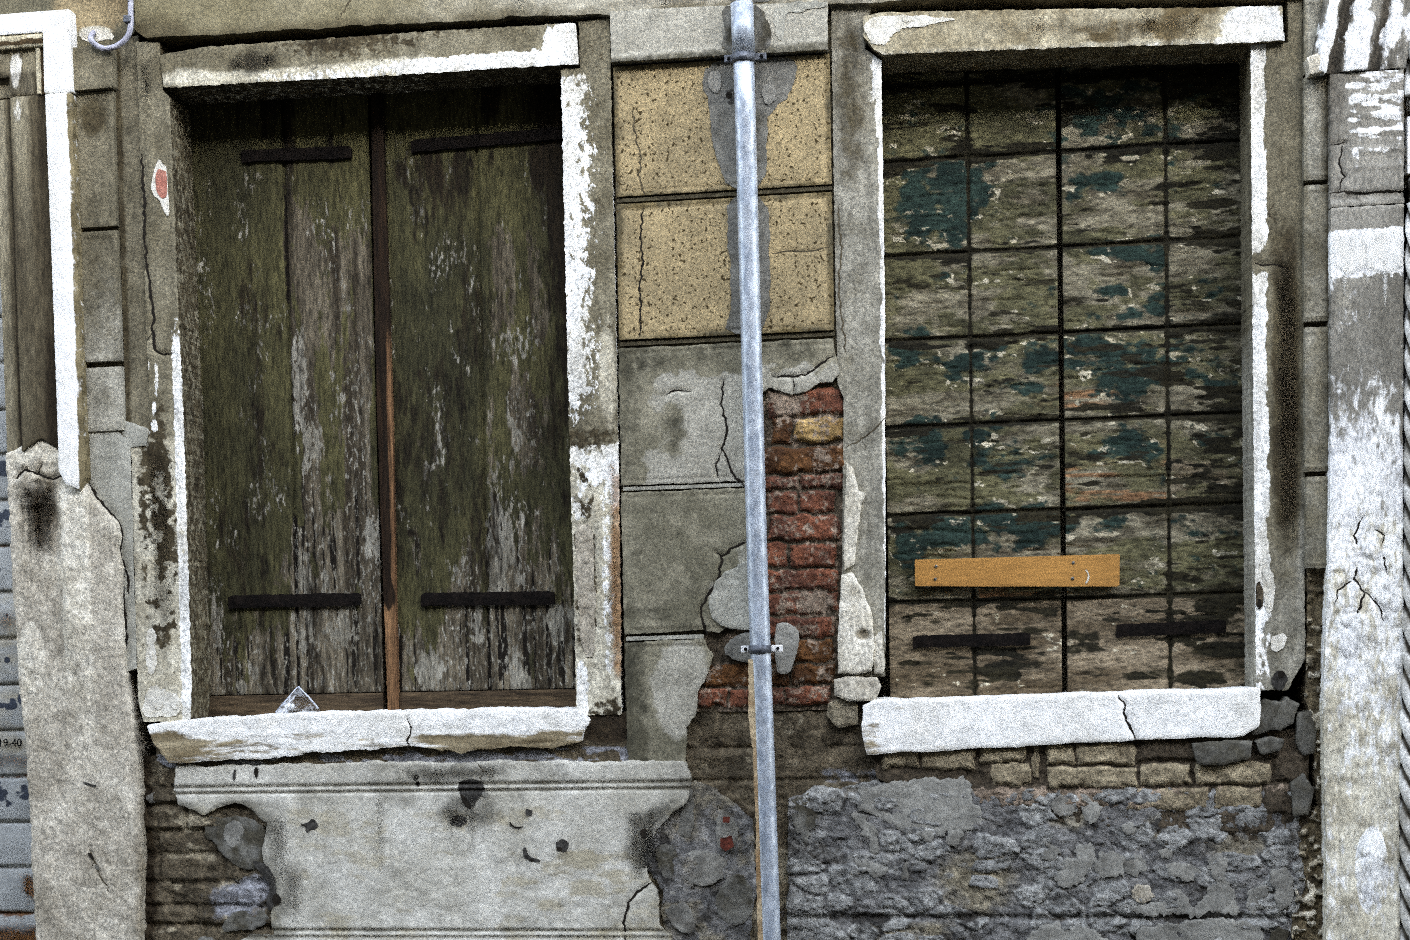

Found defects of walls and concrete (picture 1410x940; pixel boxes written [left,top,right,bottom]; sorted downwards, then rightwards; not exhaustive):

peeling [864,14,955,45]
crack [140,154,173,355]
spalling [151,160,169,216]
crack [632,112,645,337]
crack [666,381,745,487]
water stain [25,488,54,548]
spalling [697,561,750,712]
spalling [763,386,844,711]
crack [1334,517,1388,621]
crack [1118,695,1136,740]
spalling [143,754,281,940]
spalling [640,780,757,940]